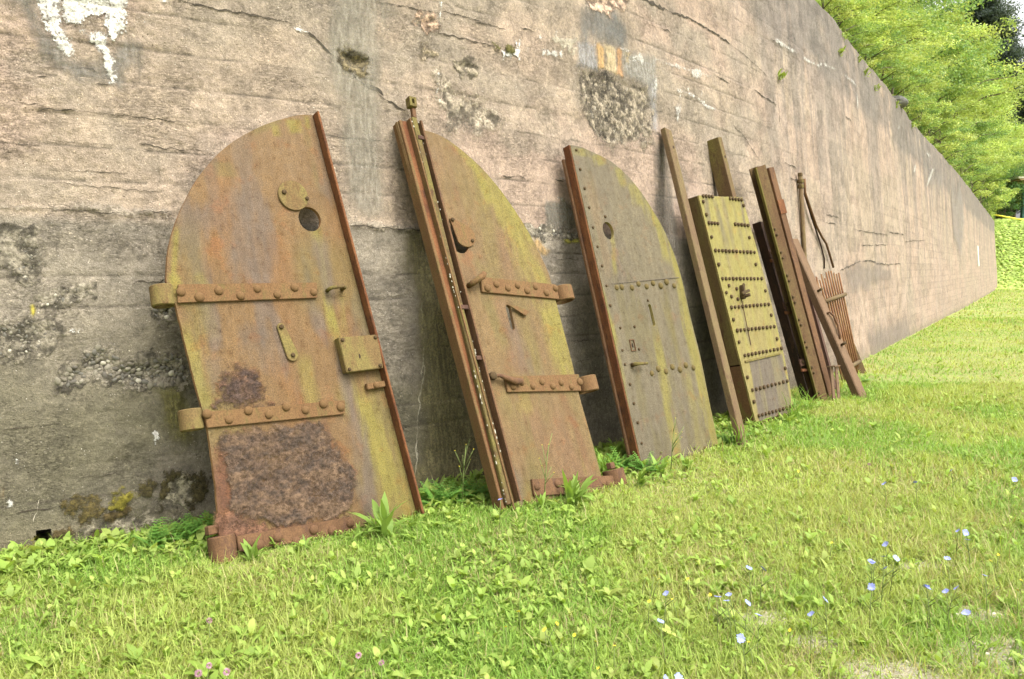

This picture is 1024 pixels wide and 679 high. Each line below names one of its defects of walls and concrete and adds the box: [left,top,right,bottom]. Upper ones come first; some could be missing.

damp [19,0,137,85]
crack [179,0,405,111]
spalling [337,45,369,78]
crack [645,0,780,121]
spalling [578,63,655,153]
crack [826,215,926,270]